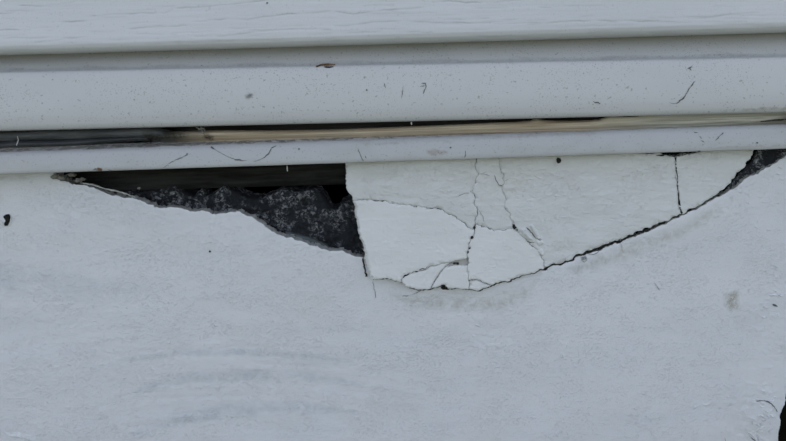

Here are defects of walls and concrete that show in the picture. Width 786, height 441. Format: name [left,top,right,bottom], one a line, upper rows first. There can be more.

spalling [50,172,365,256]
crack [362,149,786,297]